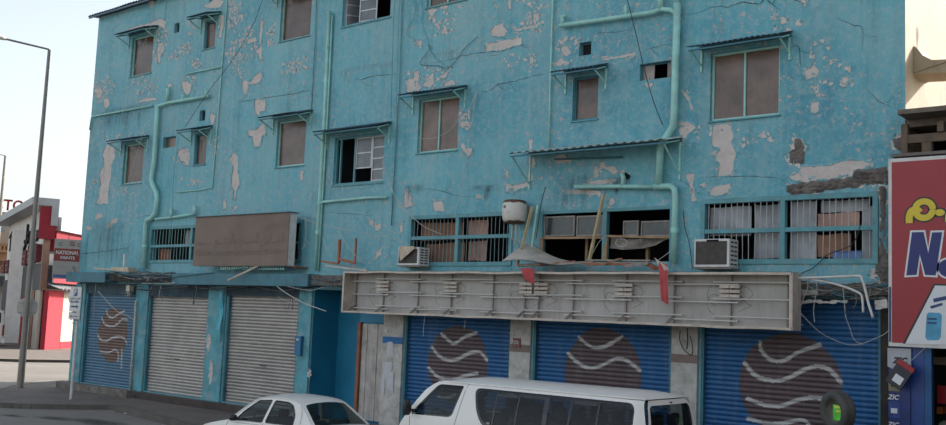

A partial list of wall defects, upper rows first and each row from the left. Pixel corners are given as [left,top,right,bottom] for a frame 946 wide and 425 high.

peeling [93,71,115,109]
peeling [202,0,275,149]
peeling [405,66,456,93]
peeling [426,2,462,37]
peeling [484,0,544,73]
peeling [552,35,580,67]
peeling [770,11,803,32]
peeling [801,39,854,115]
peeling [85,128,146,231]
peeling [222,150,241,212]
peeling [677,89,777,203]
spalling [784,133,888,310]